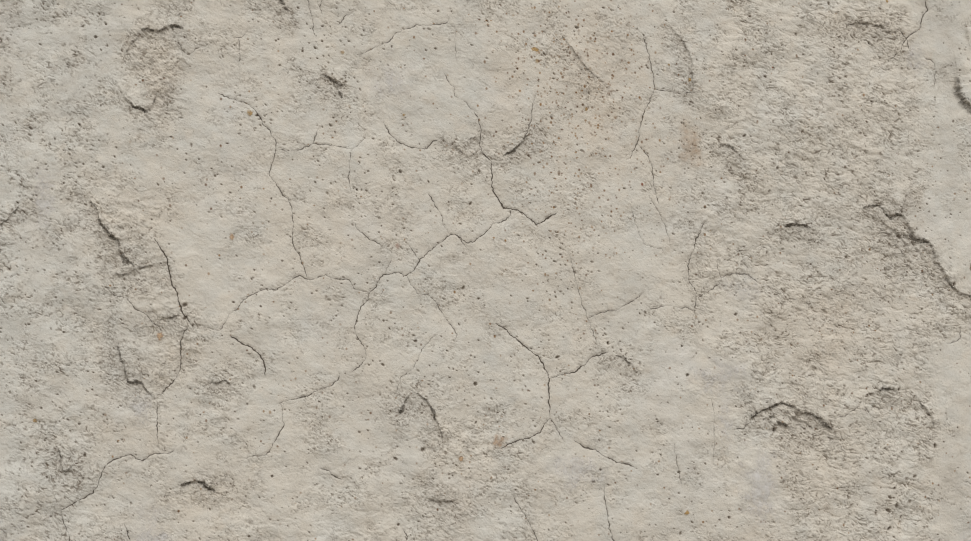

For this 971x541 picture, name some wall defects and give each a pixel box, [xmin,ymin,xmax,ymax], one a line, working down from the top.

crack [62,238,193,541]
crack [221,94,556,403]
crack [495,224,756,466]
crack [631,39,688,201]